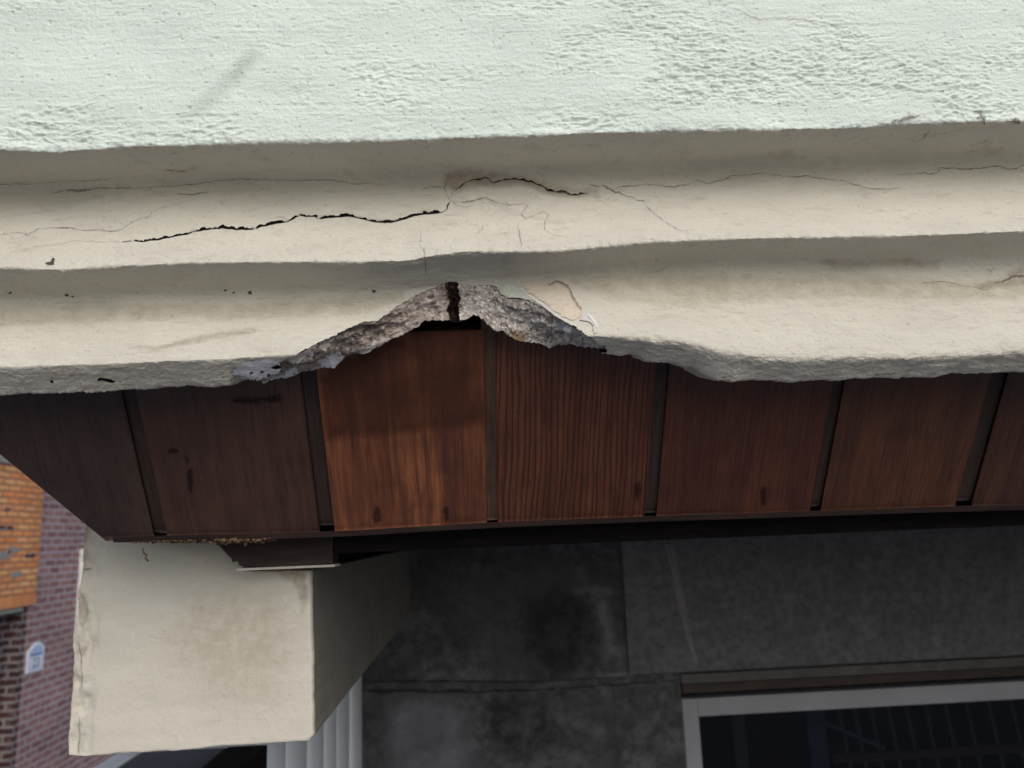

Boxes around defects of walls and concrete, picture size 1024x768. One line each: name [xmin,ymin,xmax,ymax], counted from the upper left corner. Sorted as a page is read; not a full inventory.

crack [0,140,1023,273]
spalling [231,280,606,386]